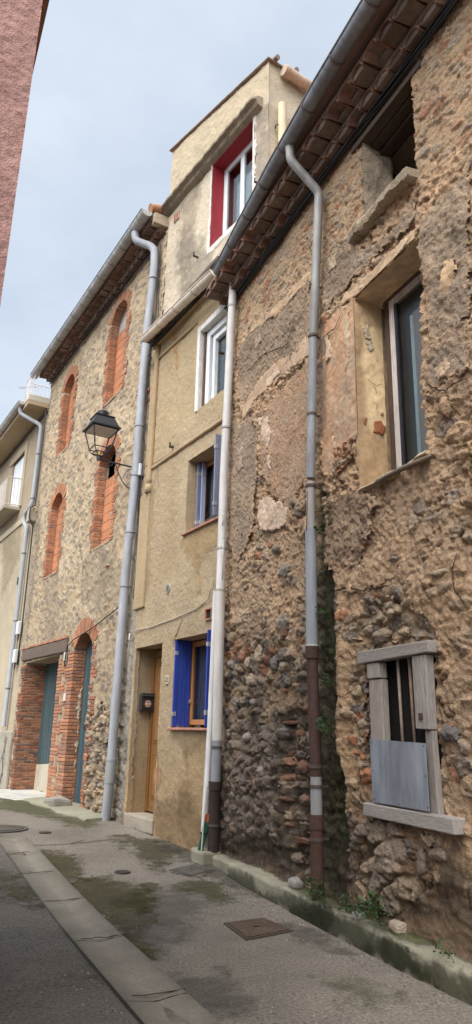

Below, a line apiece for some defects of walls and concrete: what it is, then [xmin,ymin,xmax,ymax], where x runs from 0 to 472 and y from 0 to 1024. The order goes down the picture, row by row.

crack [249,318,295,370]
flaking render [227,159,472,562]
flaking render [271,545,291,578]
crack [451,554,467,606]
flaking render [227,643,290,712]
damp [227,868,260,893]
spalling [346,820,449,917]
damp [366,937,438,989]